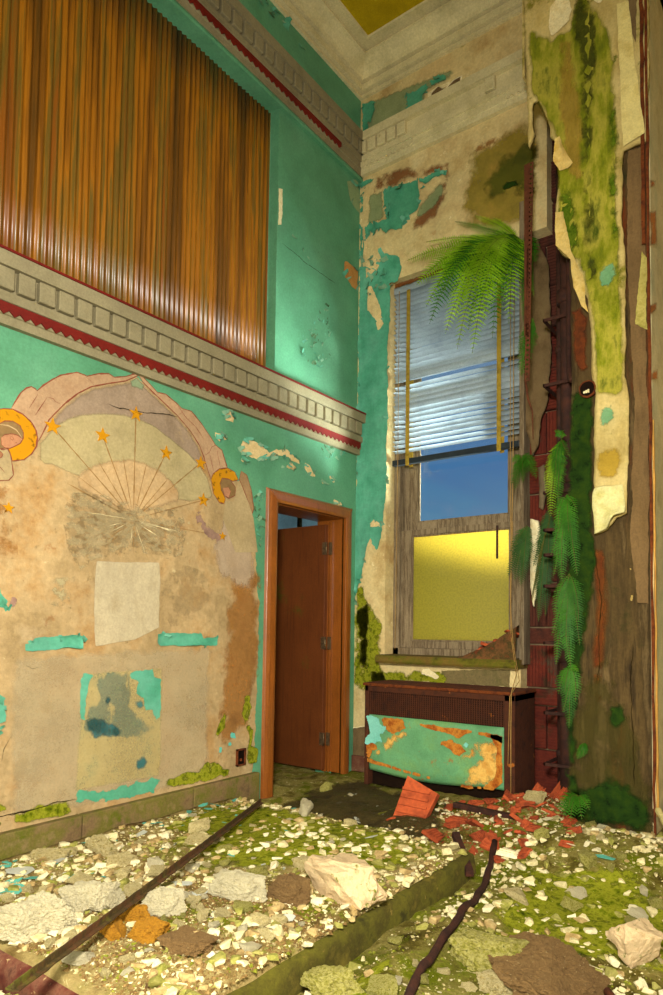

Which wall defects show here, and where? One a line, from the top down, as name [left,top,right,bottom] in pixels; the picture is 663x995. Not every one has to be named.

peeling [405,74,462,109]
peeling [361,101,375,131]
flaking render [553,136,573,170]
leakage [464,129,535,226]
flaking render [555,212,589,313]
peeling [321,168,447,605]
peeling [238,437,336,485]
peeling [0,377,265,832]
flaking render [353,726,365,756]